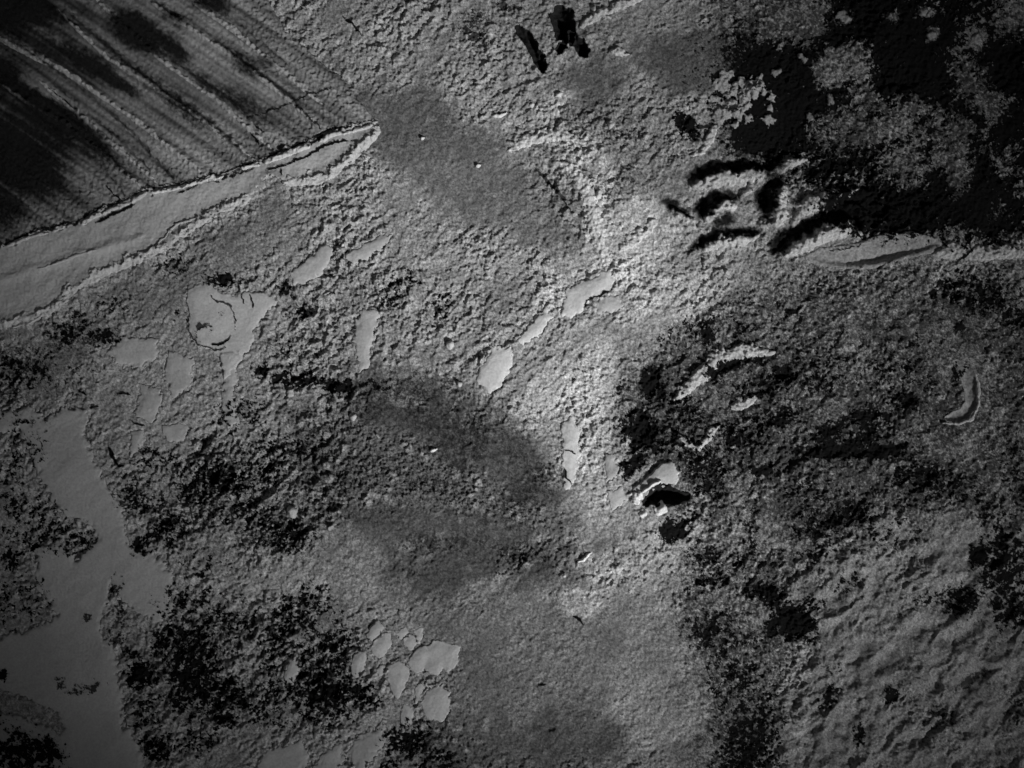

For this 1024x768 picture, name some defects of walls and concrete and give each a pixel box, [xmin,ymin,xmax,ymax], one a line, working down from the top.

peeling [0,0,381,246]
spalling [0,194,251,330]
peeling [289,231,392,285]
peeling [351,308,380,373]
peeling [476,270,624,396]
leakage [609,0,1024,768]
peeling [560,416,581,490]
spalling [602,453,693,518]
peeling [0,403,175,768]
peeling [351,620,461,726]